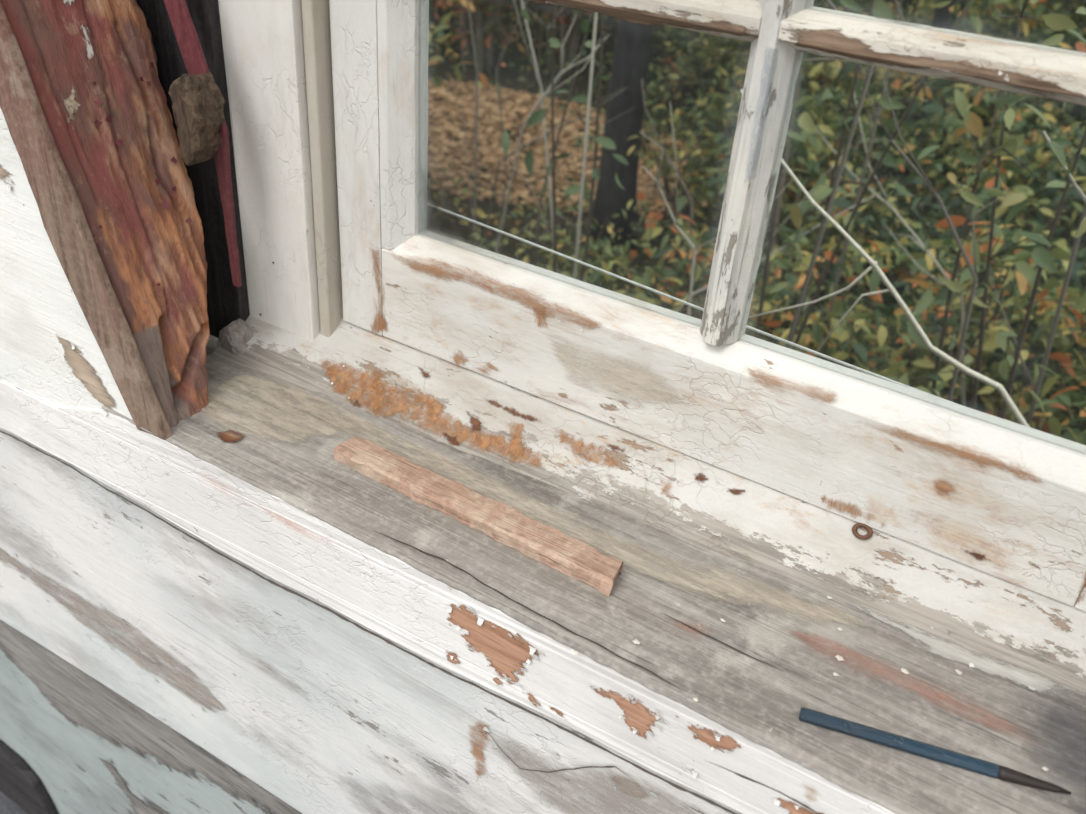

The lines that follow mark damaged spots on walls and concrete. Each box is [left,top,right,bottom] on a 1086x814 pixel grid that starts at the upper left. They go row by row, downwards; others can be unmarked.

peeling [794,28,1086,99]
peeling [0,166,12,191]
peeling [56,336,115,416]
peeling [0,548,223,712]
crack [0,431,738,814]
peeling [445,603,567,721]
crack [663,613,783,671]
peeling [0,620,302,814]
peeling [589,685,741,754]
peeling [488,733,693,814]
crack [705,760,820,814]
peeling [774,788,824,814]